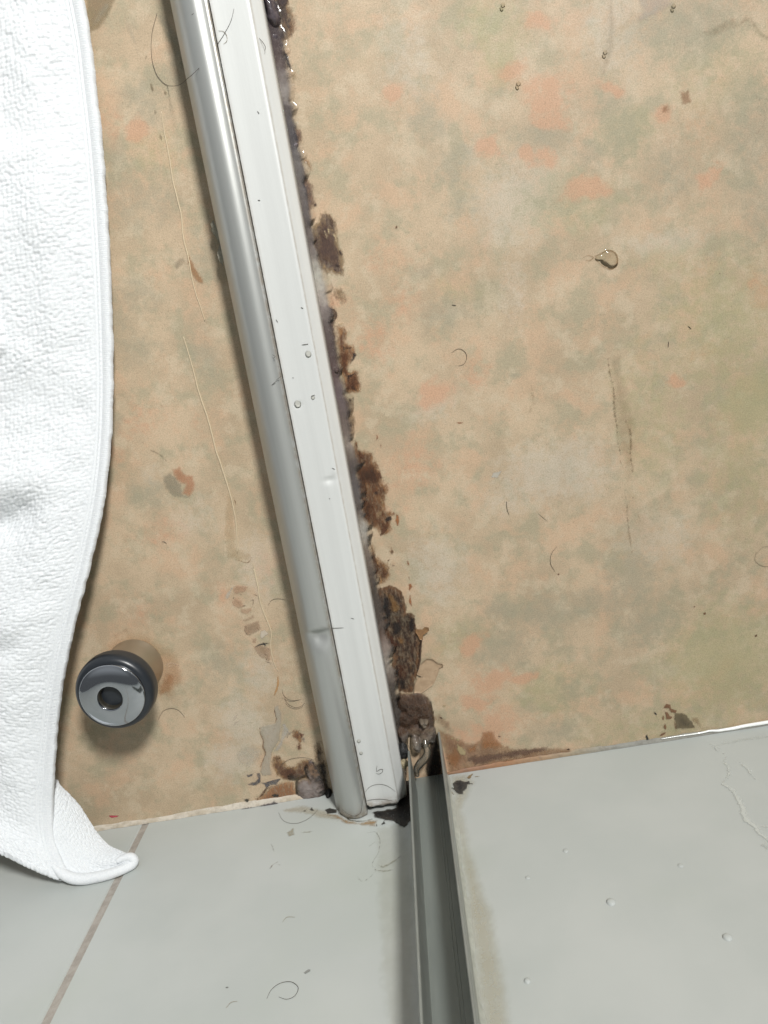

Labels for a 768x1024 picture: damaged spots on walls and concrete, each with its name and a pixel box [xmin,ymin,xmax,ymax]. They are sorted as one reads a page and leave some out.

peeling [414,627,443,693]